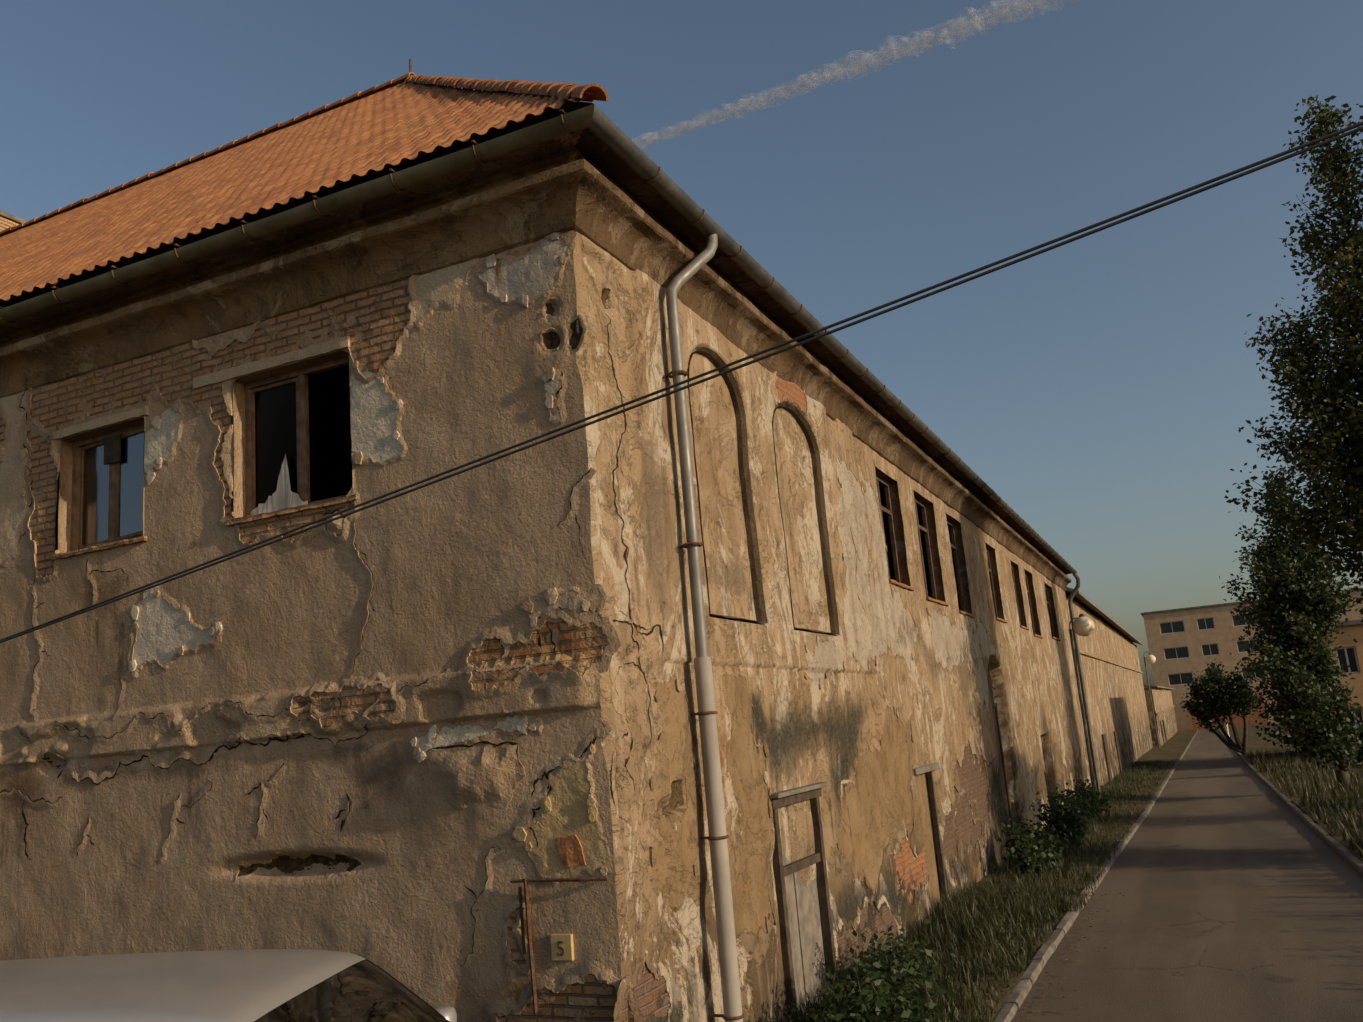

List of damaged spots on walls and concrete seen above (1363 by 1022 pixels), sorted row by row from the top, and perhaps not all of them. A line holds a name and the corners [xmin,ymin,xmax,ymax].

flaking render [0,230,586,583]
flaking render [129,583,223,680]
crack [0,313,655,971]
flaking render [288,584,621,763]
flaking render [512,721,623,886]
leakage [751,696,863,824]
flaking render [484,898,673,1022]